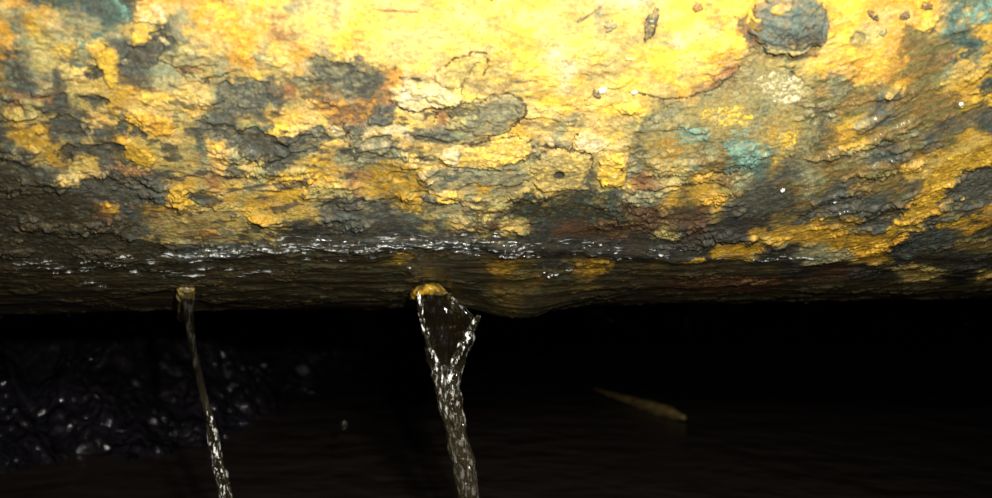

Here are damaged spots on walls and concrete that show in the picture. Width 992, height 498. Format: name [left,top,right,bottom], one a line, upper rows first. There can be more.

corrosion [737,14,817,62]
corrosion [311,92,378,126]
corrosion [11,120,59,161]
corrosion [360,156,430,212]
corrosion [100,201,119,214]
corrosion [575,202,704,238]
corrosion [796,145,992,260]
damp [150,236,319,279]
damp [332,232,539,258]
corrosion [486,260,517,276]
corrosion [572,257,614,278]
corrosion [725,243,765,256]